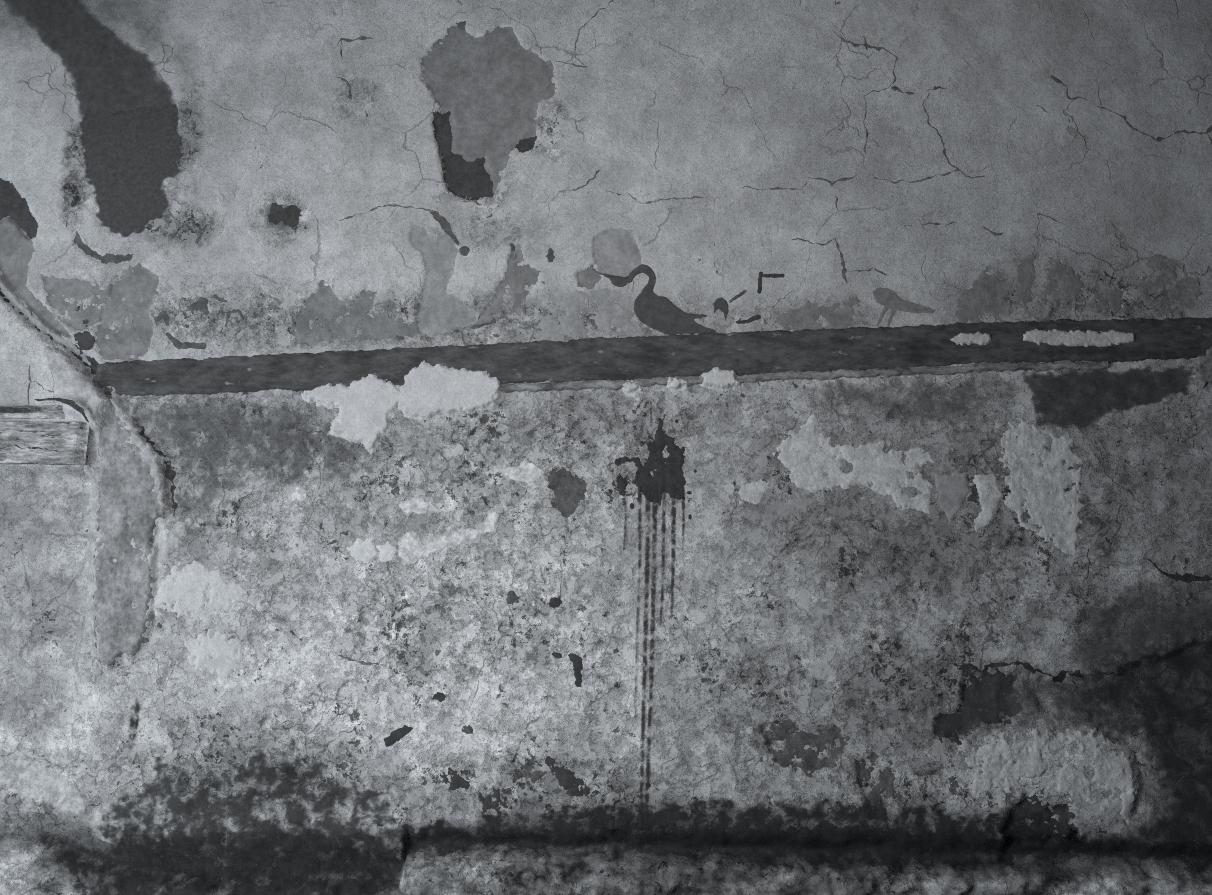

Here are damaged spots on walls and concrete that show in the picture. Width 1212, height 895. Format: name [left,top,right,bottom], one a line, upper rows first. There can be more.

crack [557,0,613,68]
crack [336,35,372,117]
flaking render [421,21,557,201]
crack [743,32,985,208]
crack [1036,75,1212,145]
crack [338,200,482,225]
crack [559,170,703,204]
crack [792,238,887,283]
peeling [301,360,502,454]
crack [1143,557,1212,583]
crack [960,640,1211,683]
leakage [0,596,1212,895]